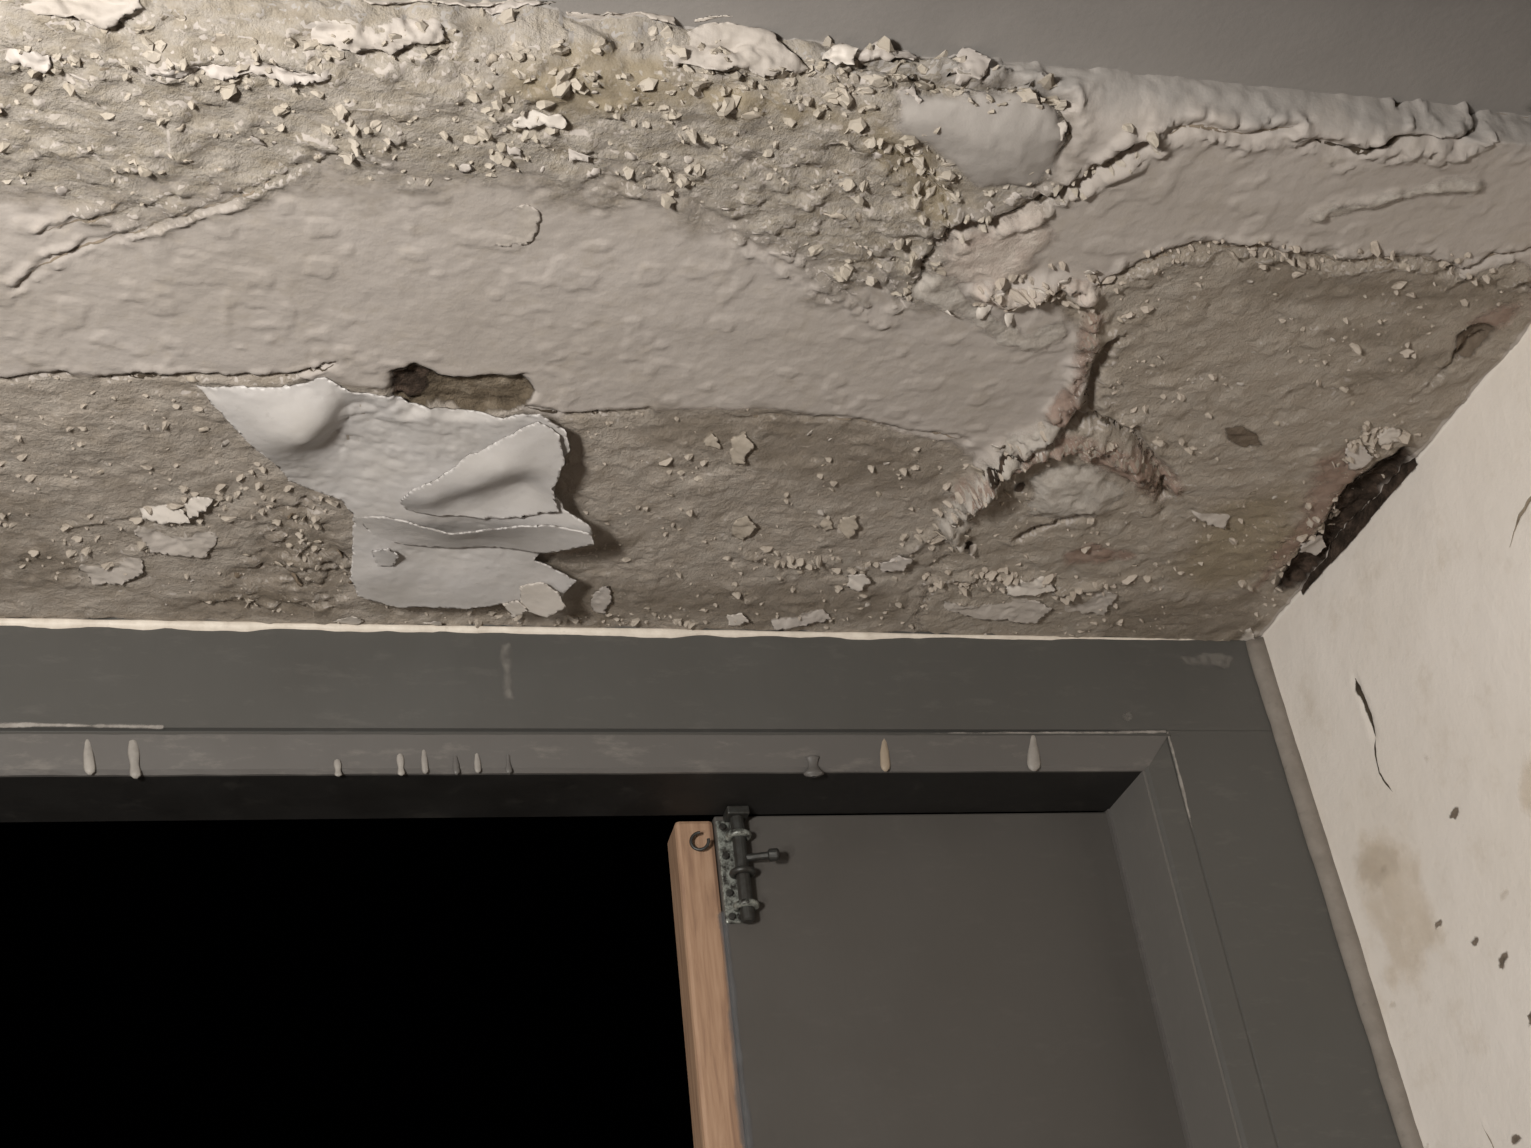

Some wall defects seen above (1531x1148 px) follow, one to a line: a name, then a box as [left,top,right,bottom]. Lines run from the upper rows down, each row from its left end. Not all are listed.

peeling [0,0,1531,641]
crack [1137,241,1531,288]
crack [1081,360,1169,487]
crack [1510,496,1531,545]
crack [1355,678,1392,791]